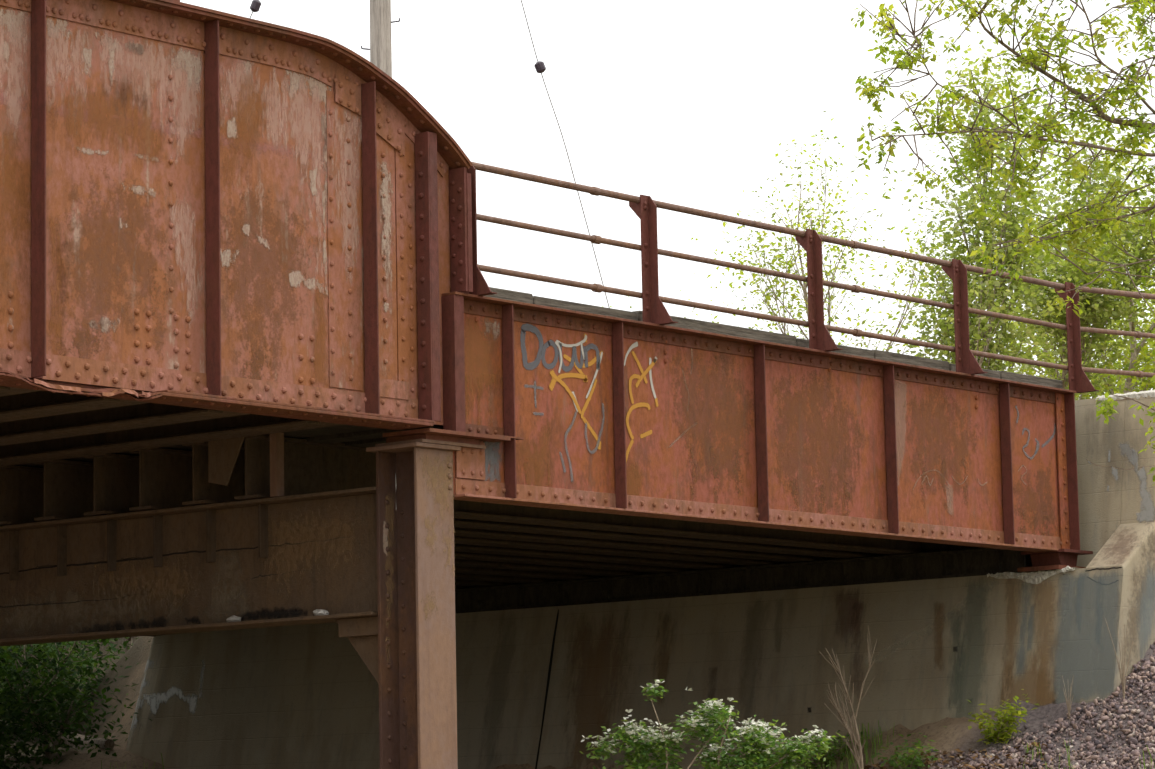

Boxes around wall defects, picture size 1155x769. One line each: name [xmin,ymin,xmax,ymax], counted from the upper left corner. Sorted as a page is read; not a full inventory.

peeling [47,18,201,157]
rust [233,84,264,159]
peeling [171,204,196,317]
peeling [221,61,362,296]
peeling [380,162,394,274]
leakage [130,660,204,731]